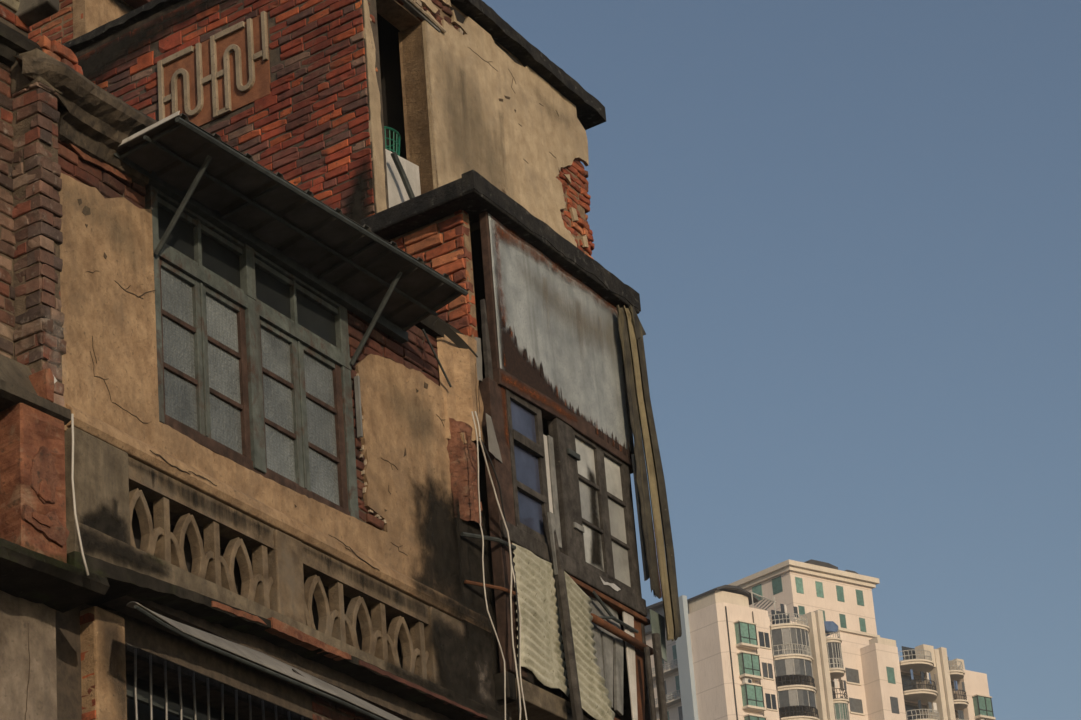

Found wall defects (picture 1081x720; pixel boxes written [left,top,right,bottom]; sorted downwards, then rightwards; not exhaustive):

spalling [396,0,464,35]
spalling [555,159,594,259]
crack [90,336,152,423]
crack [150,450,217,486]
spalling [447,418,483,528]
damp [308,478,510,720]